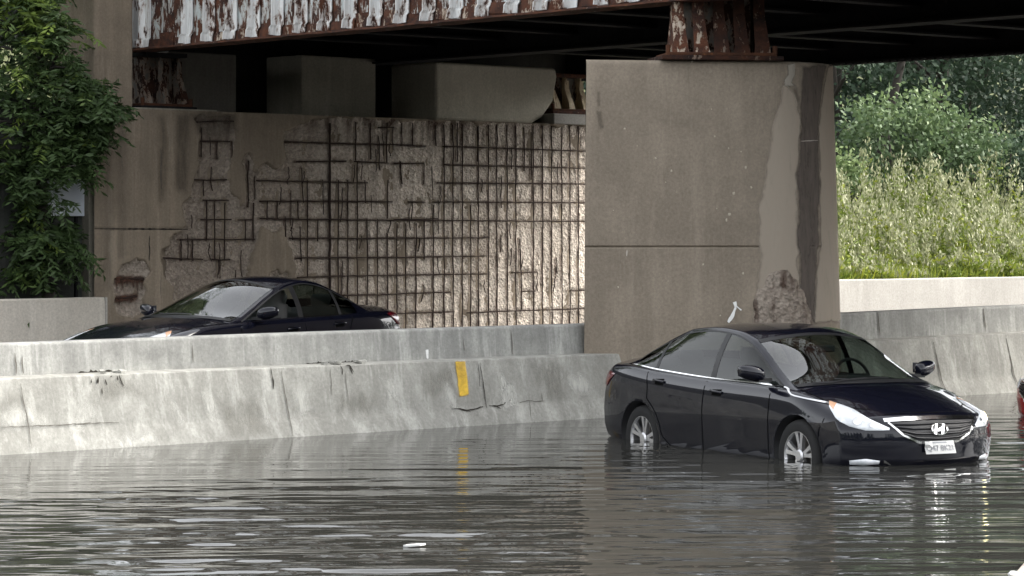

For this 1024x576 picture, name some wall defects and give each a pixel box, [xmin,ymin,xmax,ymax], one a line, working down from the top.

spalling [112,258,150,318]
spalling [163,115,586,329]
leakage [757,64,841,322]